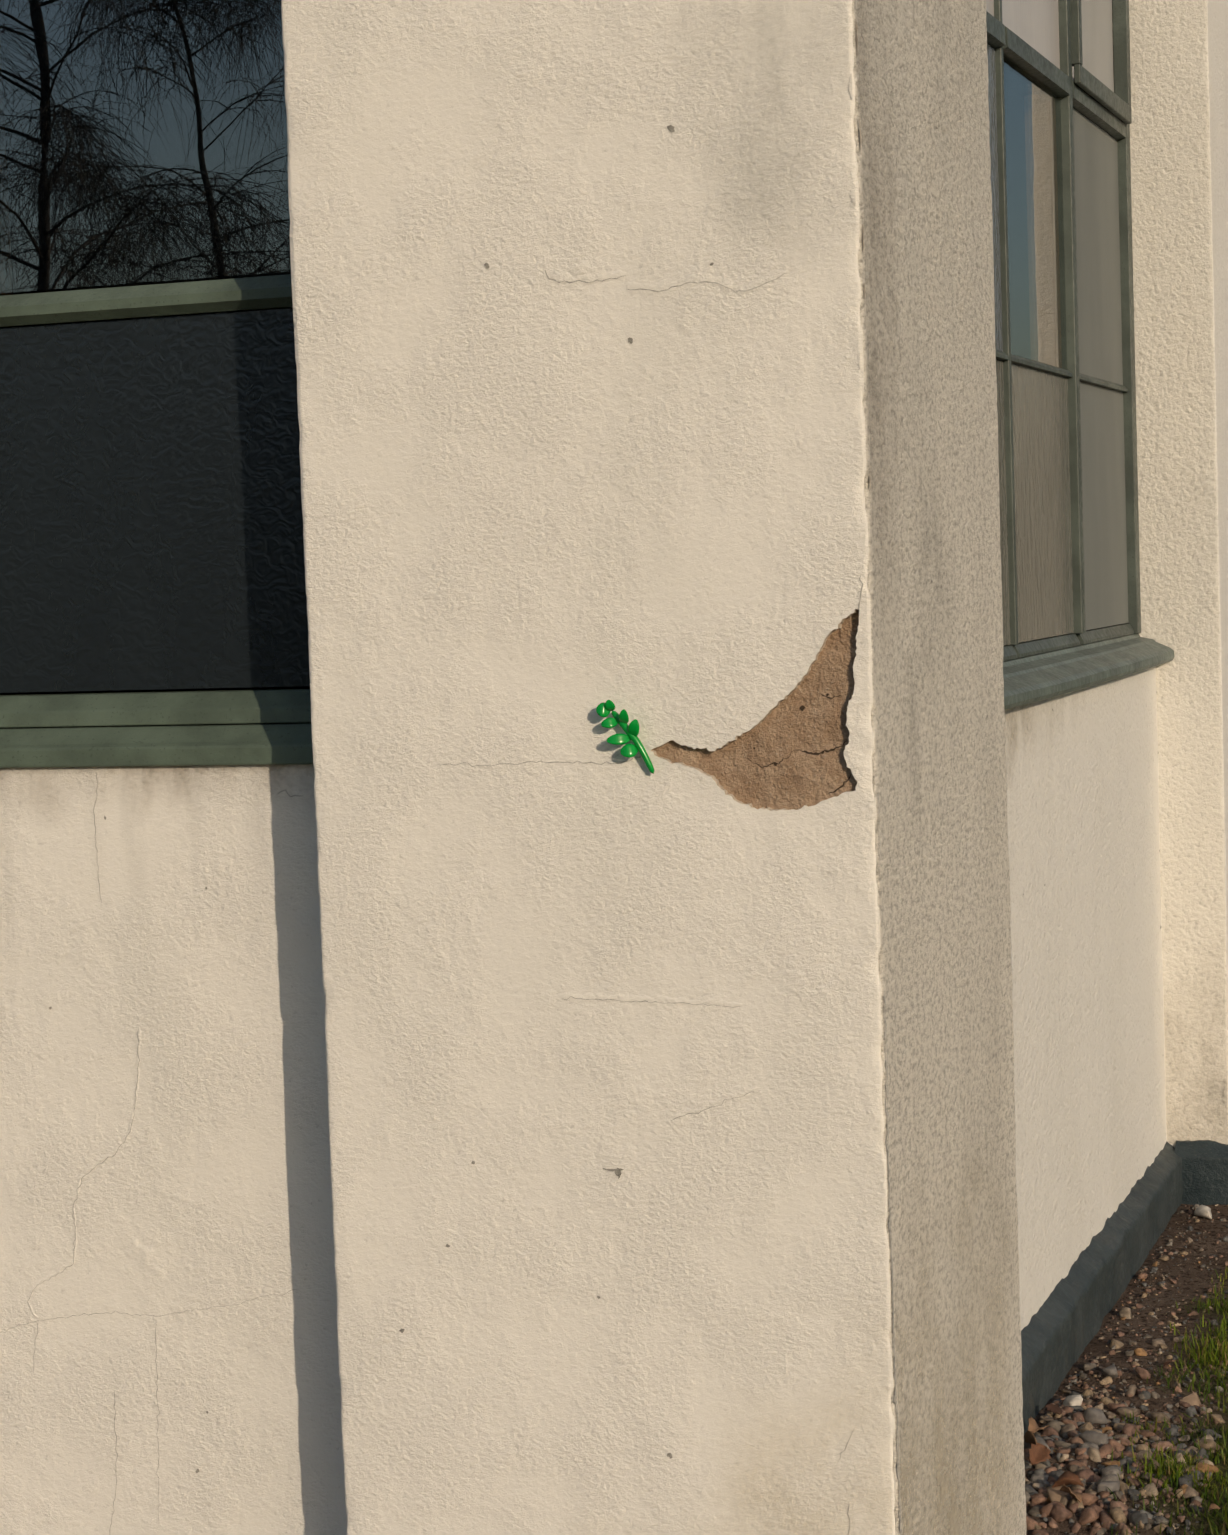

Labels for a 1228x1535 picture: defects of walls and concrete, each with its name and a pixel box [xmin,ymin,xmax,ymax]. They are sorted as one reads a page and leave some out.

flaking render [651,609,859,811]
crack [5,1027,297,1532]